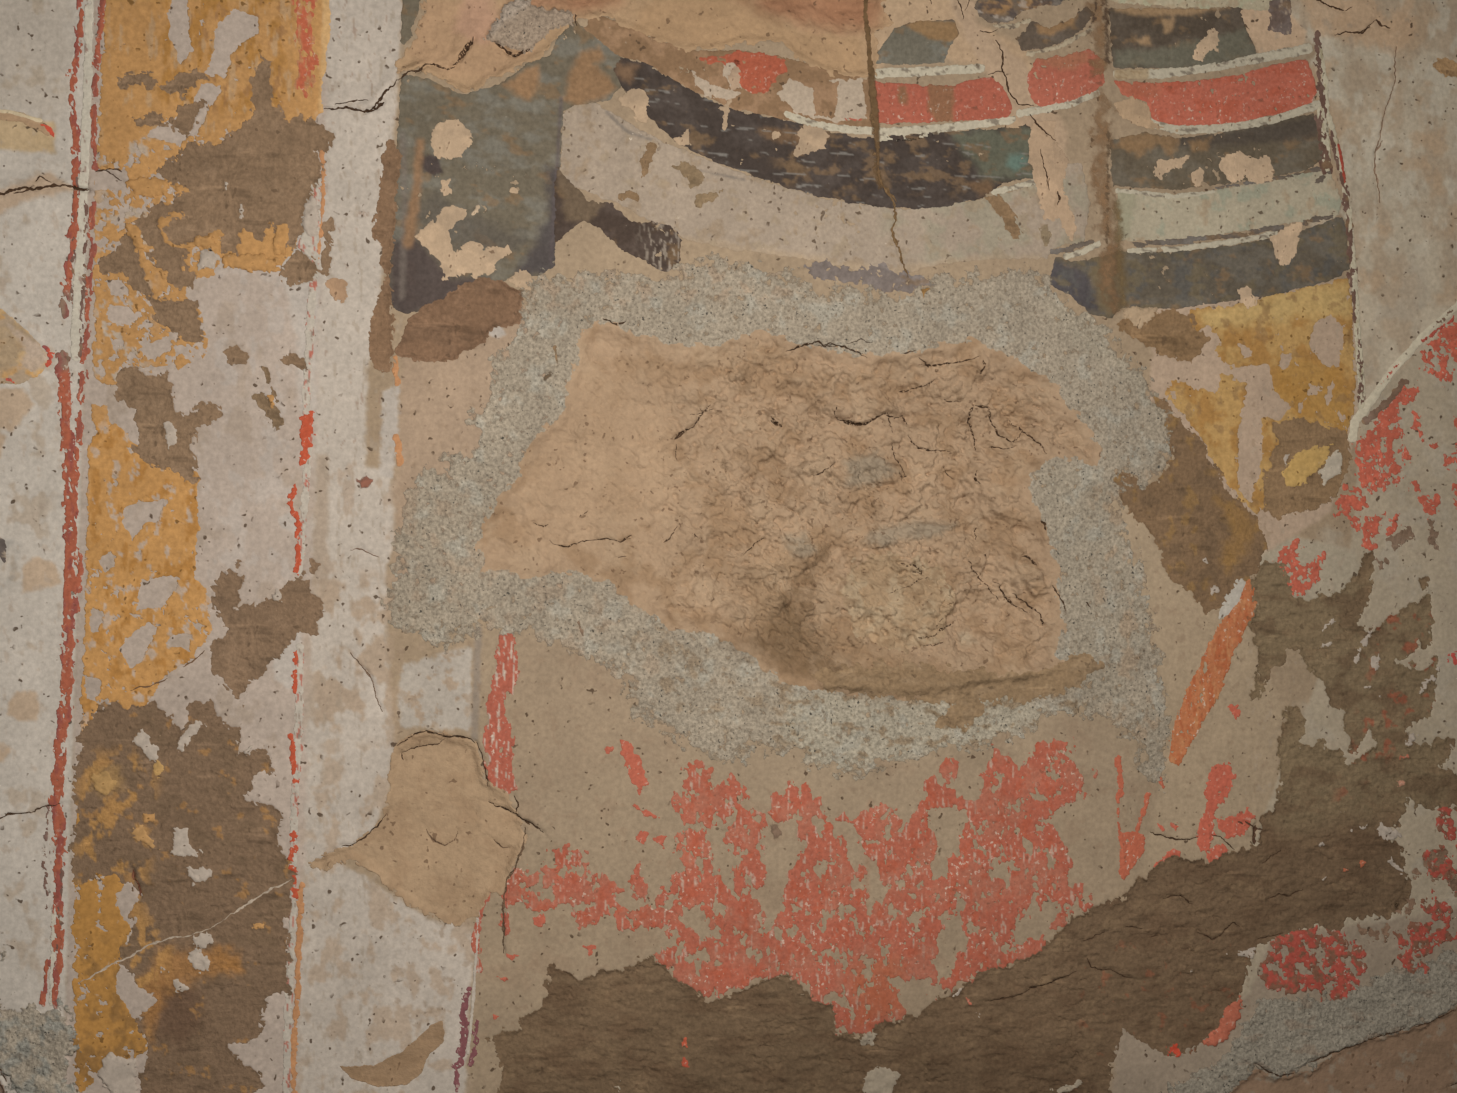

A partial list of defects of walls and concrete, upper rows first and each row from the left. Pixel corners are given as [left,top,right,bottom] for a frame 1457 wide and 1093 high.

crack [0,168,122,195]
peeling [98,53,348,343]
crack [324,37,530,113]
crack [878,175,908,276]
spalling [474,320,1105,733]
peeling [68,558,528,1093]
peeling [484,396,1457,1093]